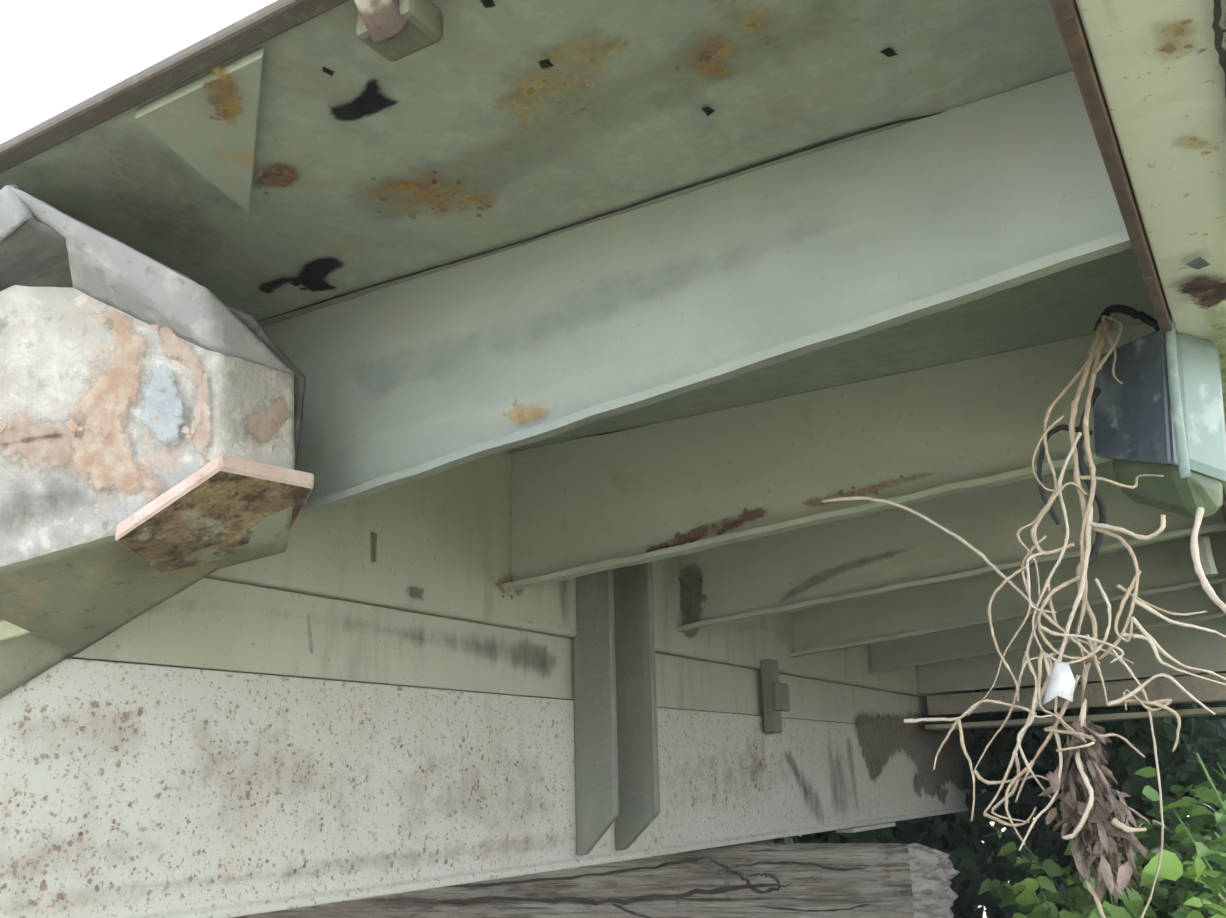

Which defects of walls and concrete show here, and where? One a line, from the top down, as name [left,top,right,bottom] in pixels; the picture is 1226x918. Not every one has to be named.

crack [1212,0,1226,98]
corrosion [204,68,243,120]
peeling [332,80,397,121]
peeling [259,258,343,293]
corrosion [1179,276,1226,308]
peeling [0,311,211,502]
peeling [246,396,290,453]
corrosion [646,508,764,553]
crack [412,856,873,918]